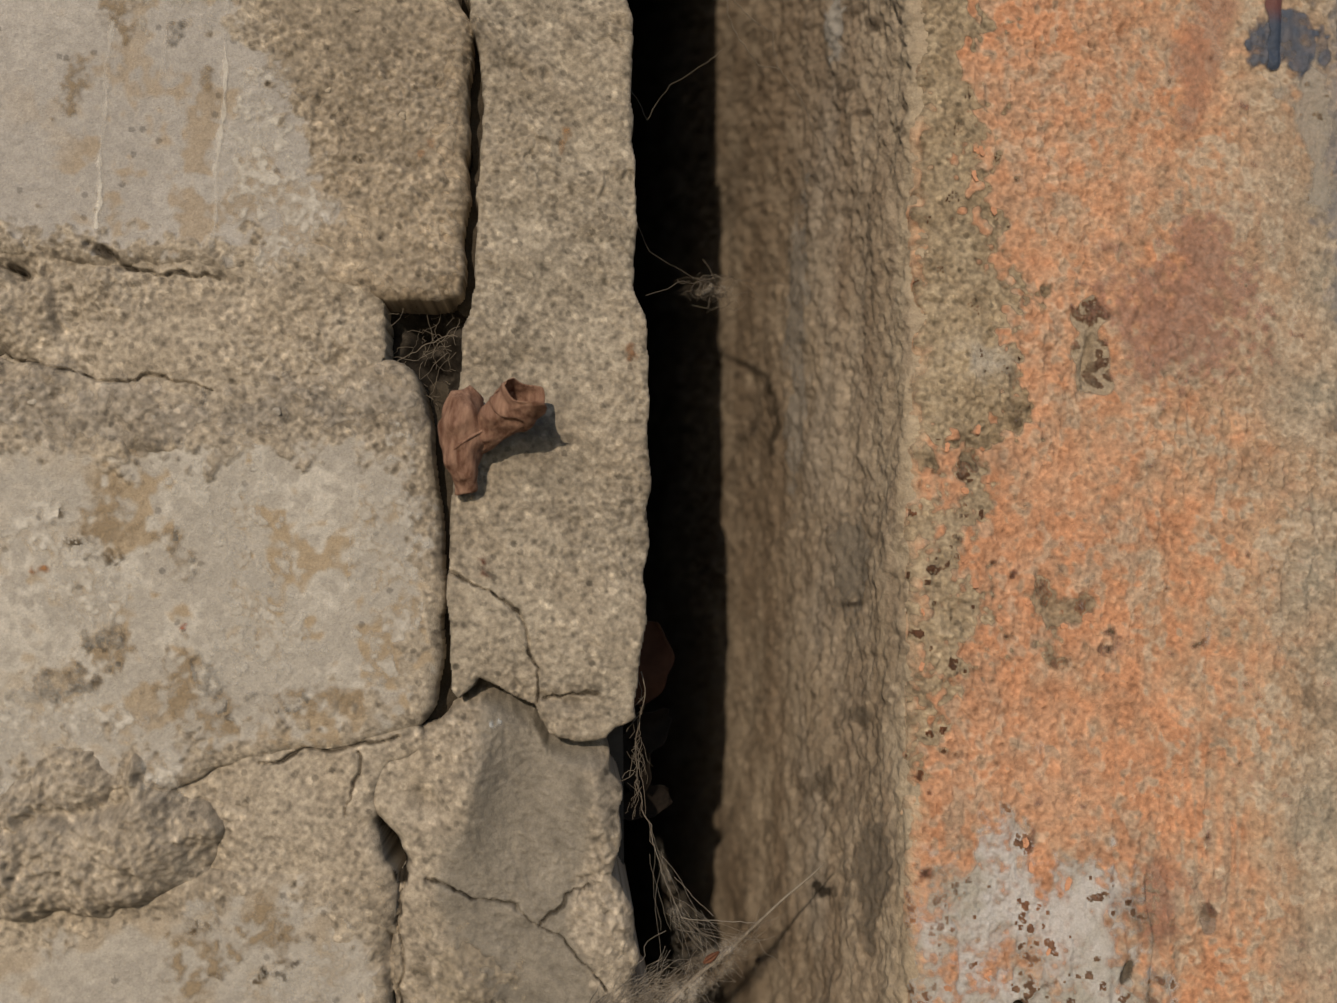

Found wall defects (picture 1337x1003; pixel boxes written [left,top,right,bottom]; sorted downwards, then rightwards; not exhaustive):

crack [457,0,484,317]
crack [98,249,221,280]
crack [1,355,168,382]
peeling [904,0,1051,781]
peeling [1070,295,1114,395]
crack [430,381,520,615]
peeling [1026,570,1096,668]
crack [273,609,458,793]
crack [527,648,598,700]
crack [398,865,568,930]
peeling [906,808,1152,1003]